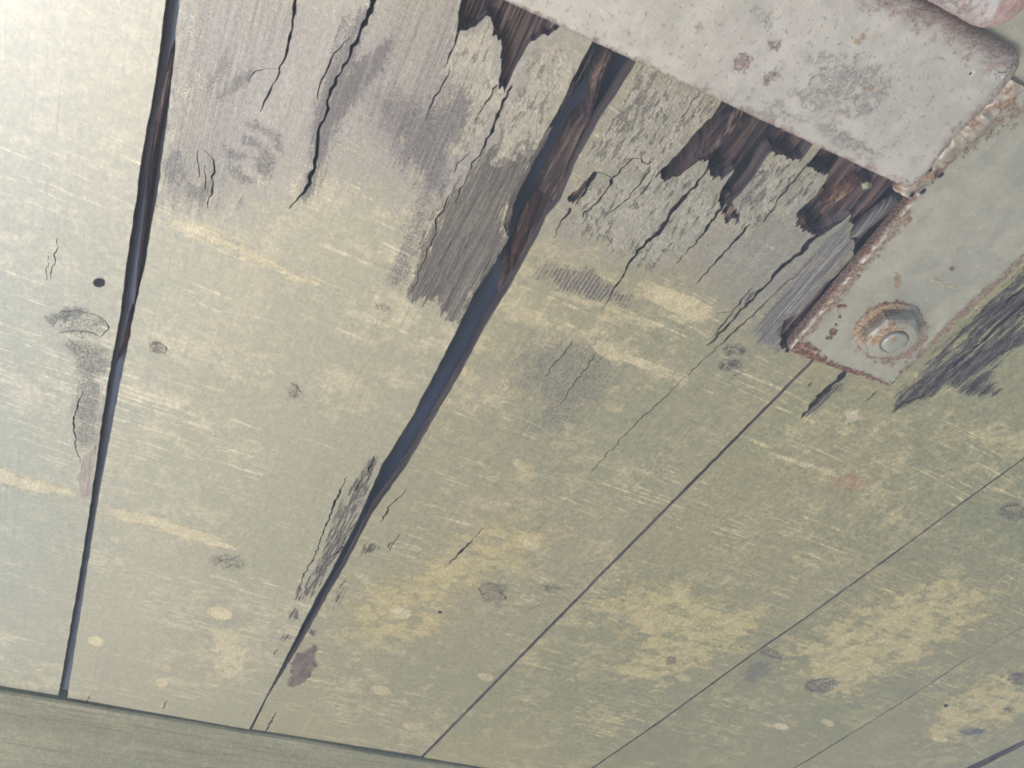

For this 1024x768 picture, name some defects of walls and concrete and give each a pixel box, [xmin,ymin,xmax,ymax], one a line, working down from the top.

leakage [43,306,93,327]
crack [249,0,297,112]
crack [289,0,377,209]
leakage [289,4,481,290]
crack [554,158,654,238]
crack [603,171,707,308]
crack [590,230,820,474]
crack [677,163,809,284]
peeling [728,155,828,239]
peeling [738,49,893,166]
peeling [860,179,872,190]
corrosion [791,185,1024,384]